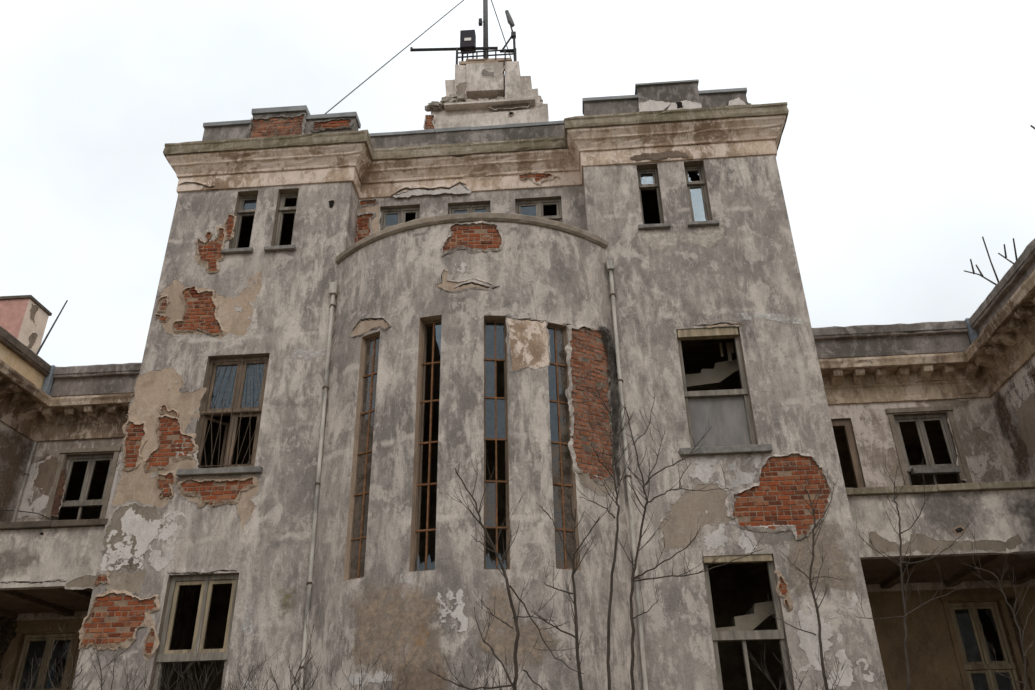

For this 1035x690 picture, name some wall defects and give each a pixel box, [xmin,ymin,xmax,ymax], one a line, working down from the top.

flaking render [356,198,381,239]
spalling [393,185,471,198]
flaking render [157,271,262,339]
spalling [349,316,392,338]
flaking render [505,317,551,373]
flaking render [65,367,261,595]